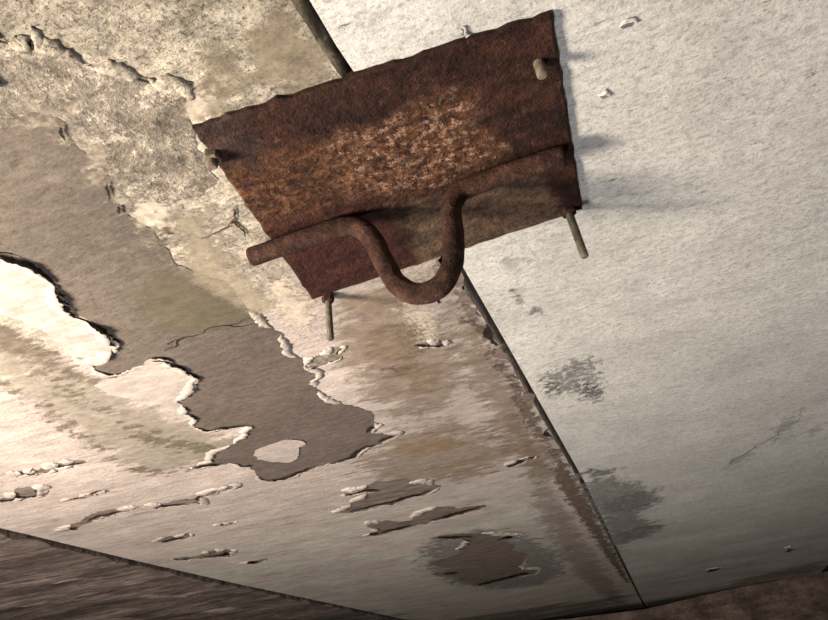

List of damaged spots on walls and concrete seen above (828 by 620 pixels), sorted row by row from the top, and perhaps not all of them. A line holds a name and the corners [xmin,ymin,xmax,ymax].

peeling [0,26,405,482]
water stain [392,302,437,343]
water stain [0,326,233,477]
spalling [455,272,630,583]
peeling [0,459,85,503]
peeling [54,483,243,532]
peeling [331,478,489,537]
water stain [576,469,667,545]
peeling [429,531,543,586]
water stain [412,528,570,590]